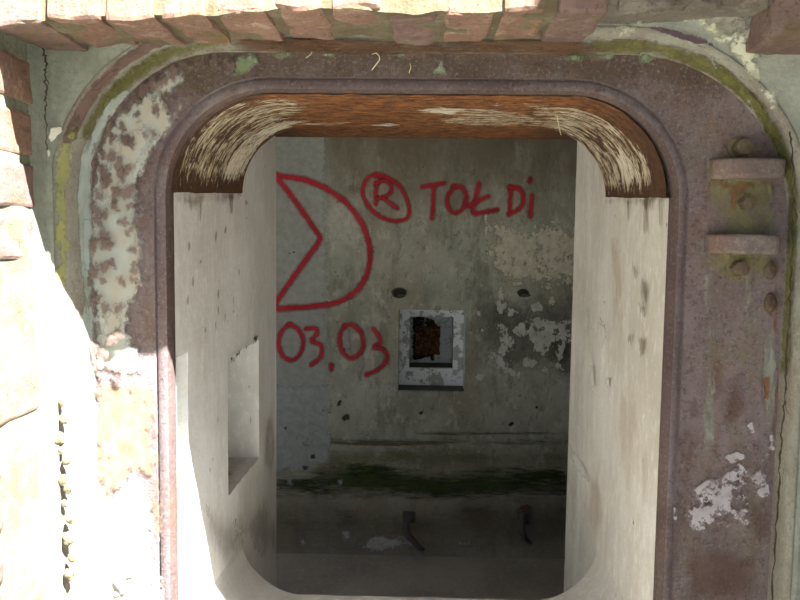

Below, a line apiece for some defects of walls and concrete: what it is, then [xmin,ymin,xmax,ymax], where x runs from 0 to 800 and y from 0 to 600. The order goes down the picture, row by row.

crack [41,48,49,150]
rust [89,329,157,493]
peeling [78,72,183,451]
peeling [484,209,575,387]
crack [771,131,798,600]